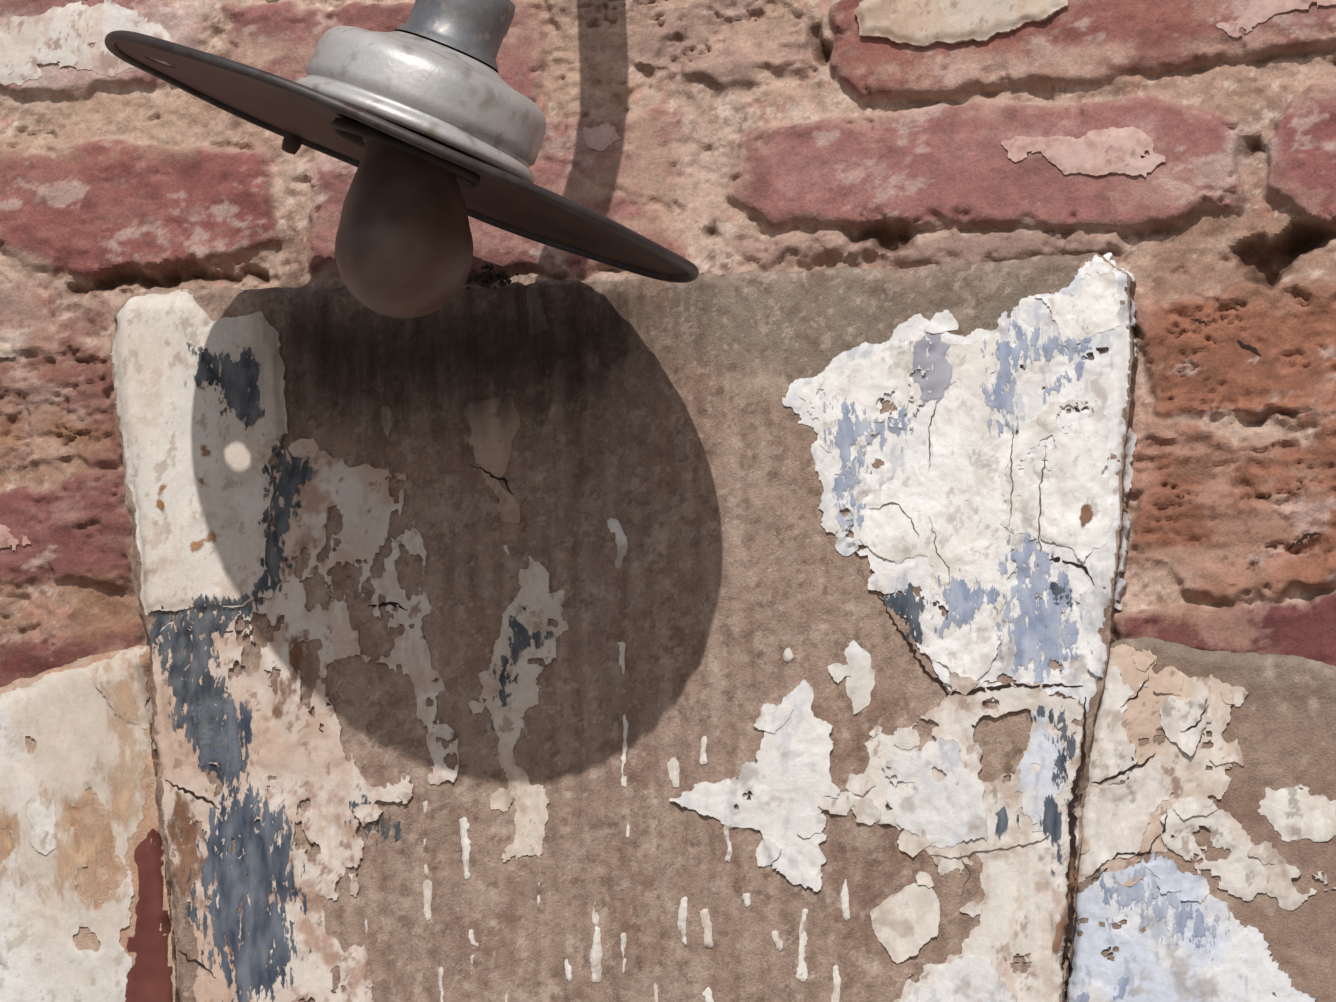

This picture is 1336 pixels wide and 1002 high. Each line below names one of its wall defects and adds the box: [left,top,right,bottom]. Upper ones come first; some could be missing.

peeling [0,0,178,85]
peeling [1215,0,1336,38]
peeling [464,395,521,524]
crack [868,502,950,588]
crack [928,402,937,467]
peeling [669,211,1336,1002]
crack [1006,424,1094,585]
peeling [0,438,459,1002]
peeling [469,556,569,862]